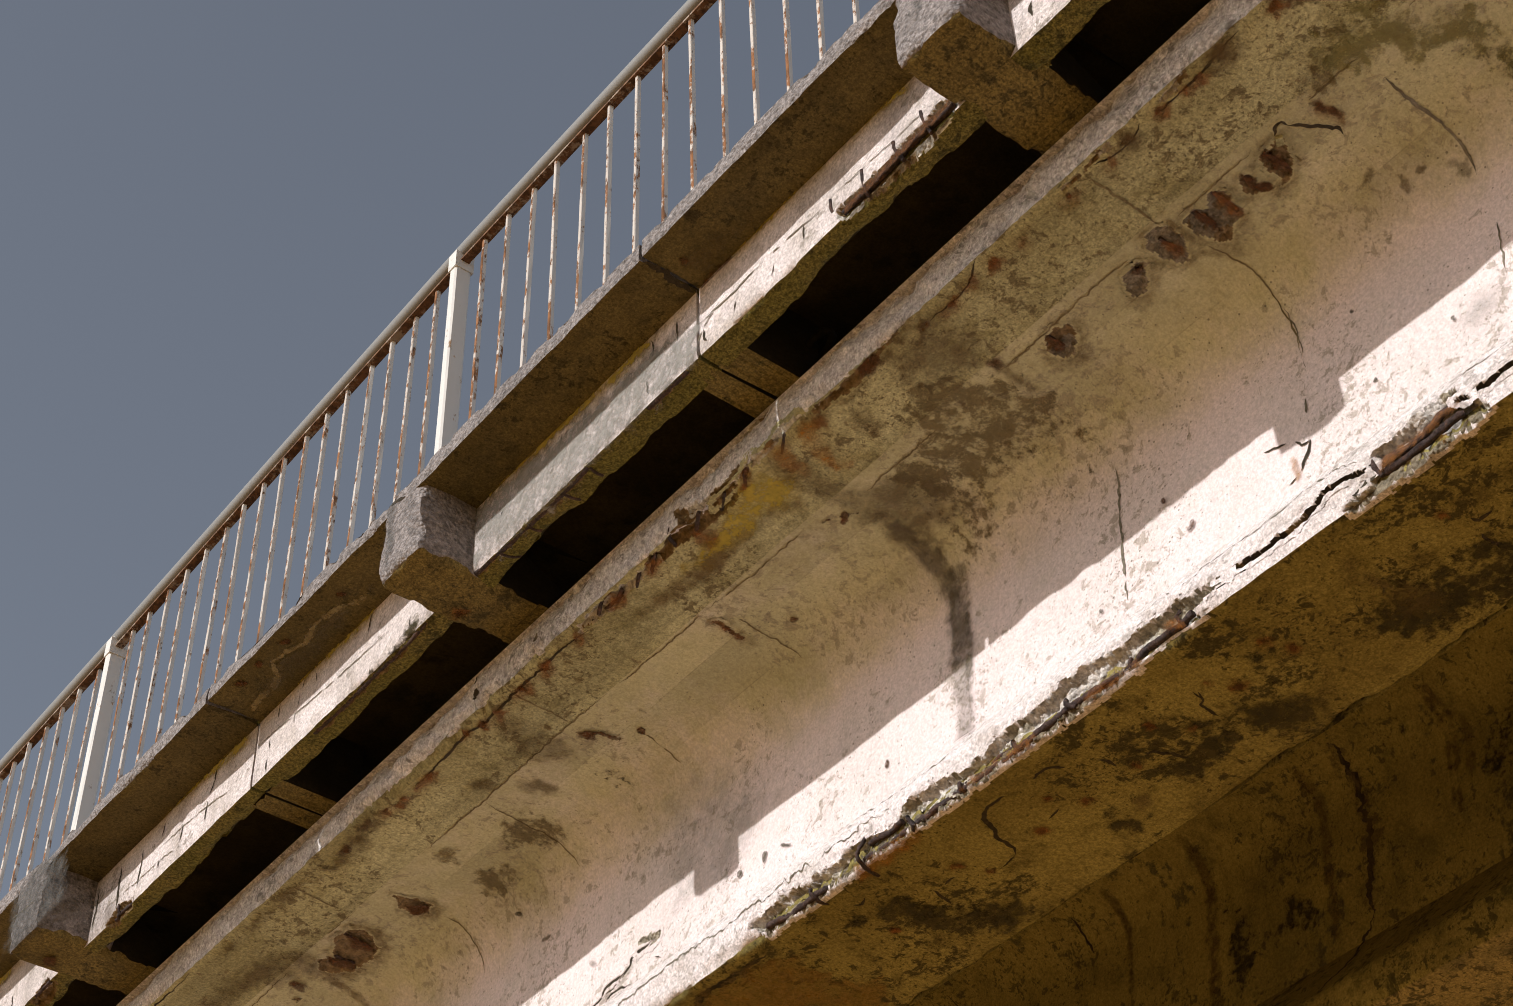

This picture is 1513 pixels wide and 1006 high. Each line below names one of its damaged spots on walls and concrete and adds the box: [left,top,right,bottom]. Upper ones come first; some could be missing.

spalling [829,97,965,227]
crack [1089,32,1476,226]
rust [1315,101,1342,117]
crack [930,261,975,321]
spalling [1038,320,1085,363]
crack [998,260,1128,374]
crack [867,430,936,491]
crack [1114,245,1382,611]
spalling [1333,381,1499,520]
crack [415,534,802,865]
spalling [744,565,1236,941]
crack [1314,743,1376,995]